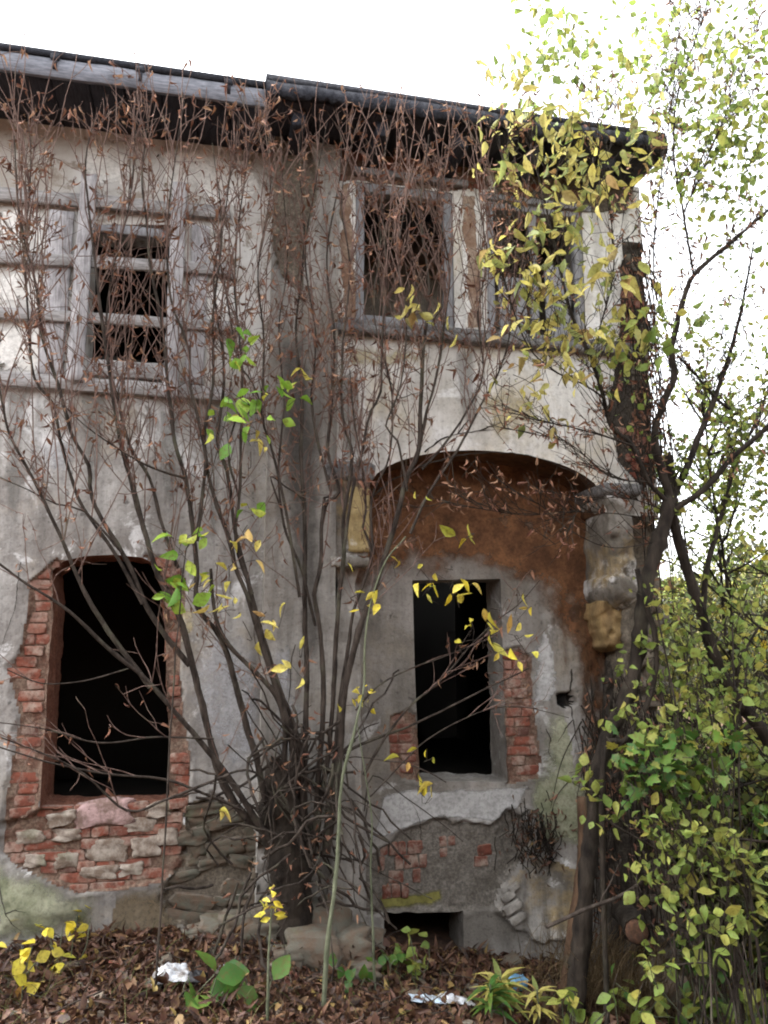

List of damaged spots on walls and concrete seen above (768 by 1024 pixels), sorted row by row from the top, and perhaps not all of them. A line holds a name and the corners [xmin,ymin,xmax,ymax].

spalling [3,555,256,926]
spalling [389,711,420,782]
spalling [501,647,542,784]
spalling [366,811,528,915]